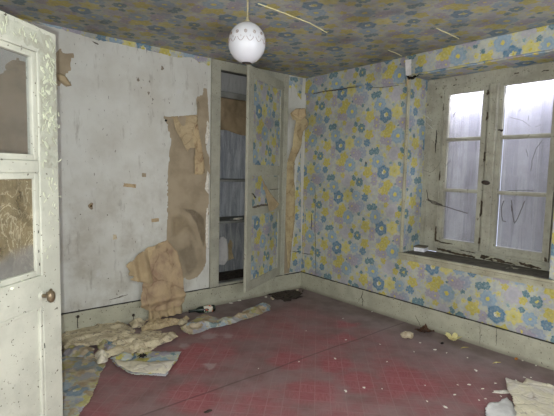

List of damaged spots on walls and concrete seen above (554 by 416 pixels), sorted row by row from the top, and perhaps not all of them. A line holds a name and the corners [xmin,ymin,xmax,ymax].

peeling [0,14,74,229]
peeling [164,88,210,280]
peeling [434,226,547,269]